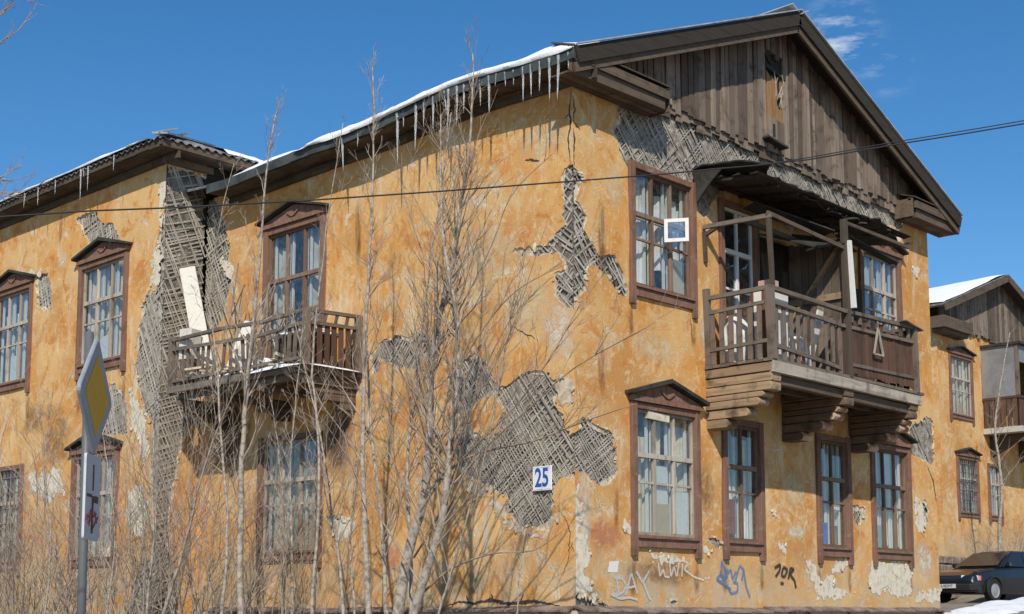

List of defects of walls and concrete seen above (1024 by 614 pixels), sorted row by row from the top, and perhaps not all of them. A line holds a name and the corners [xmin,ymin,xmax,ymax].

crack [565,93,580,167]
flaking render [611,106,905,242]
flaking render [76,212,120,244]
flaking render [512,164,628,310]
flaking render [19,268,52,311]
flaking render [103,164,234,614]
flaking render [909,416,935,465]
peeling [27,467,65,505]
flaking render [447,353,618,610]
peeling [913,496,929,533]
peeling [804,556,856,601]
peeling [868,560,942,604]